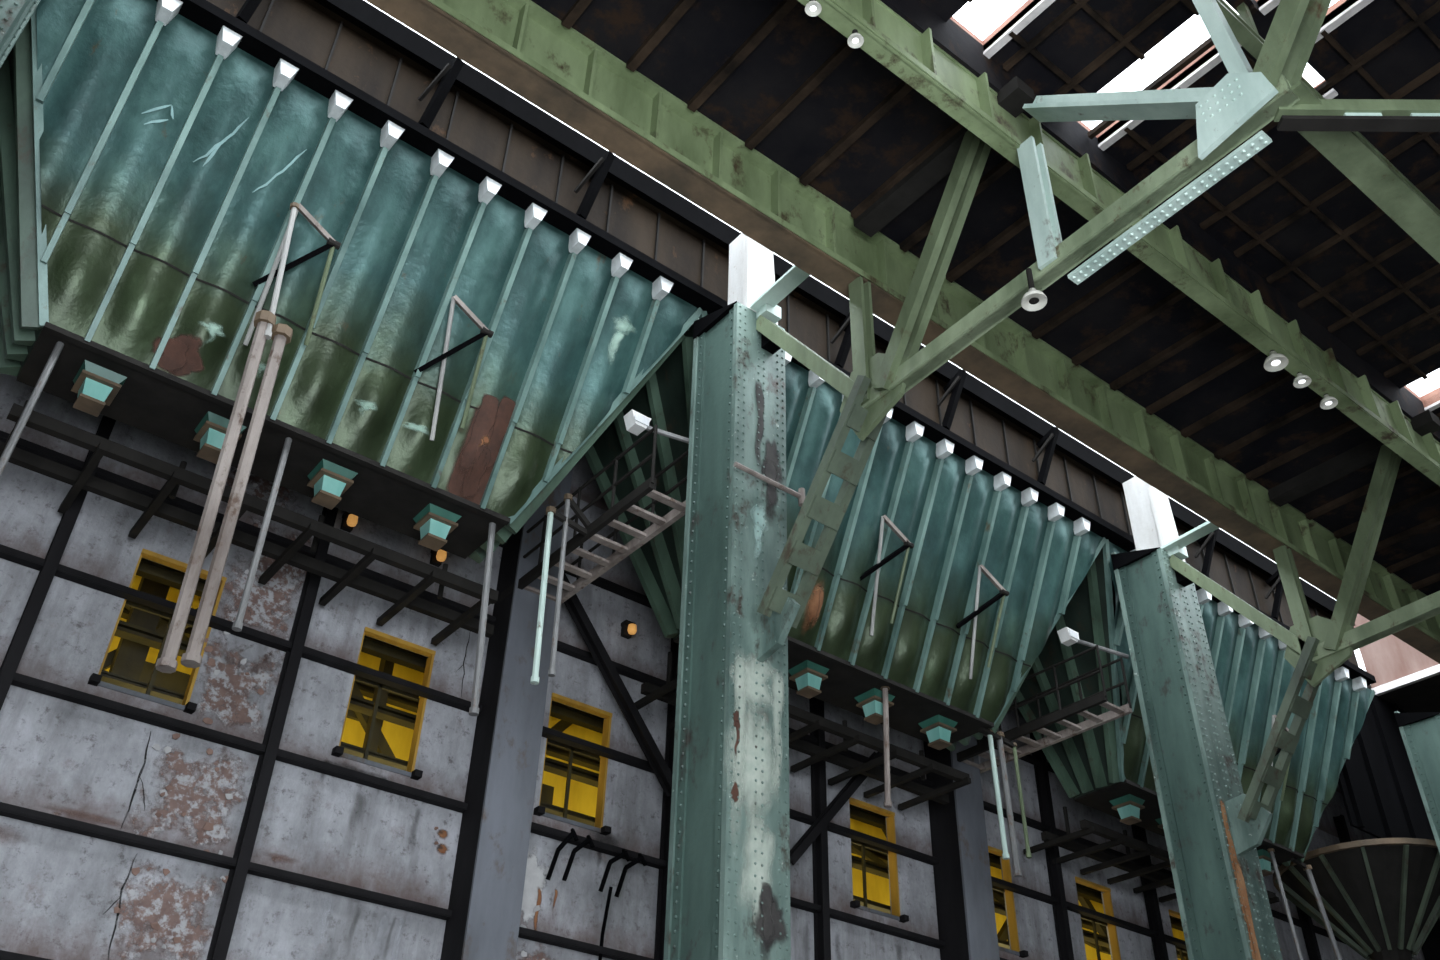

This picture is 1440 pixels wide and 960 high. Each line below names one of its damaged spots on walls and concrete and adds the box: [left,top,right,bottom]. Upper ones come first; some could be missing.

corrosion [153,335,204,377]
corrosion [447,394,516,505]
flaking render [131,733,244,855]
flaking render [114,864,229,960]
corrosion [1220,800,1261,960]